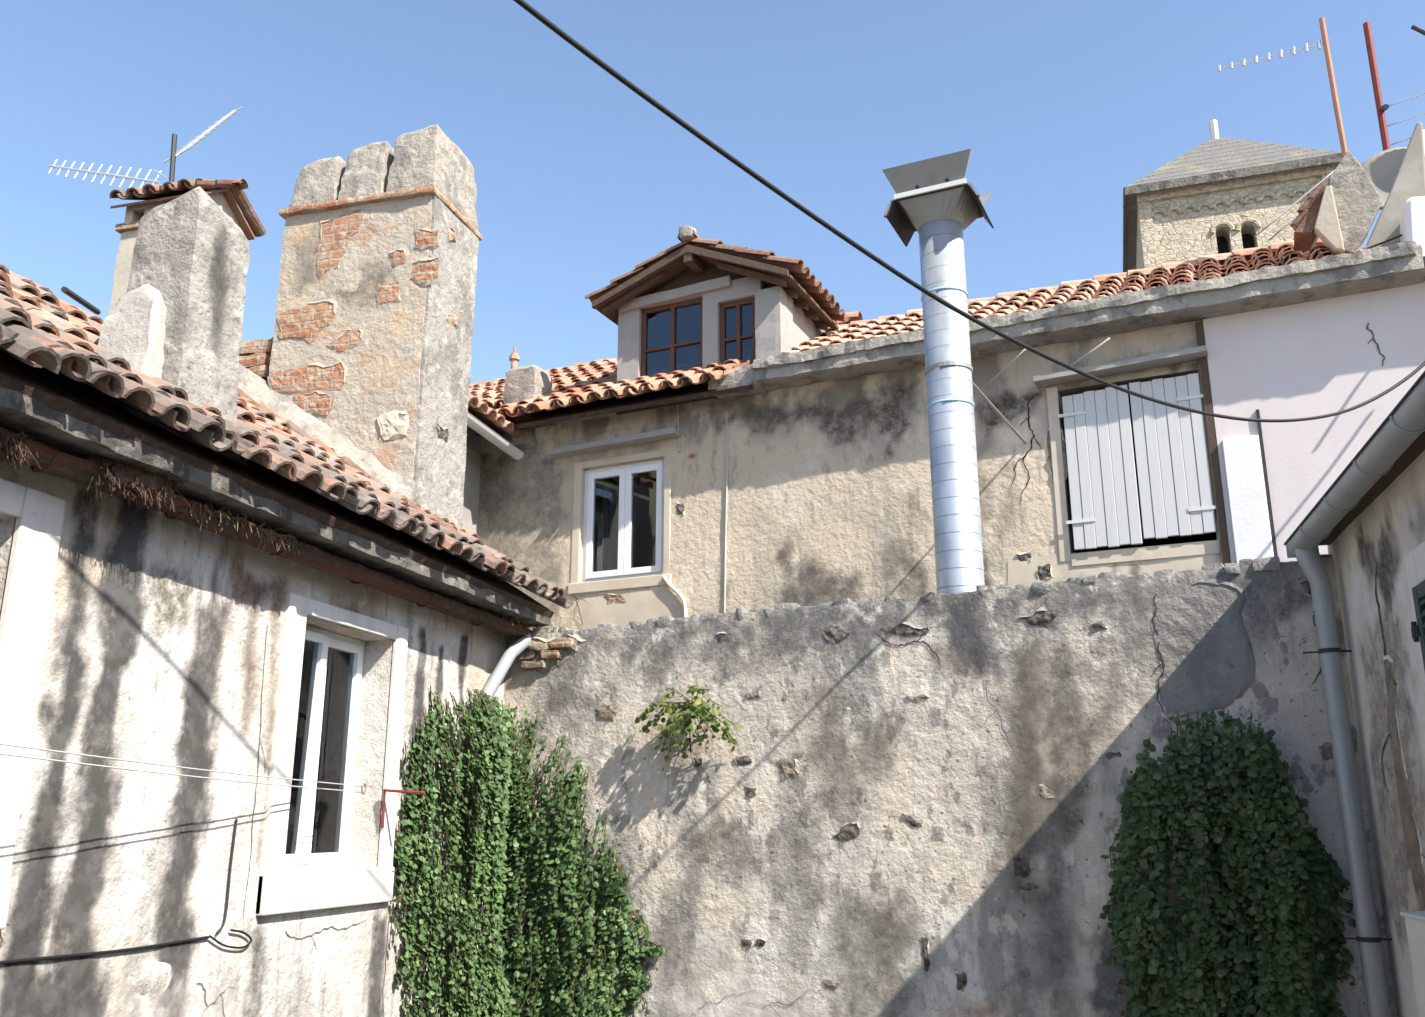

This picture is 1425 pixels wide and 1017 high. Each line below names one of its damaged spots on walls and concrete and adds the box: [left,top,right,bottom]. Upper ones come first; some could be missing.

flaking render [314,208,374,282]
flaking render [376,227,458,306]
flaking render [267,299,363,415]
crack [1366,322,1385,366]
damp [728,384,912,455]
crack [1011,395,1042,502]
damp [778,545,857,606]
spalling [880,621,933,636]
crack [1151,594,1169,718]
spalling [1154,577,1256,714]
damp [1,492,263,1017]
crack [676,990,823,1017]